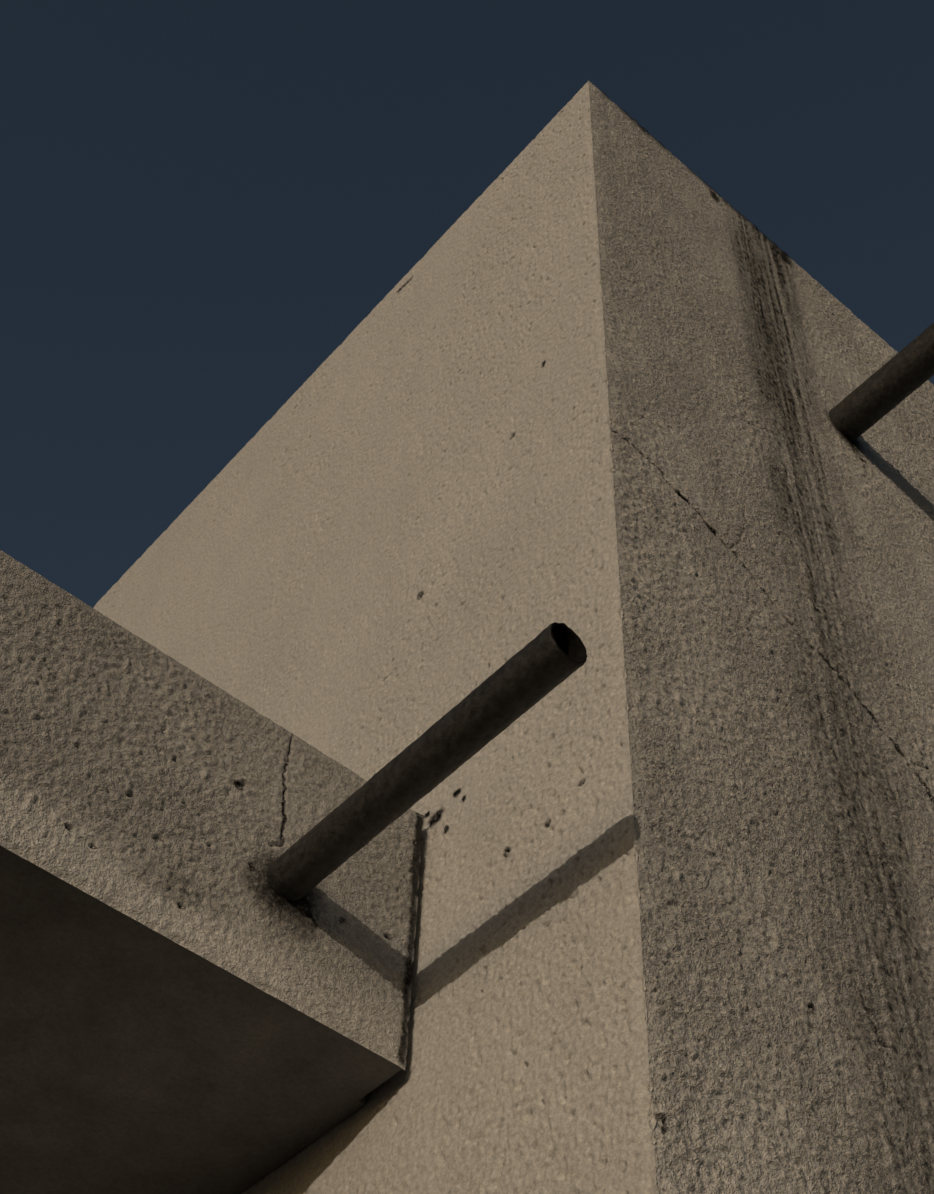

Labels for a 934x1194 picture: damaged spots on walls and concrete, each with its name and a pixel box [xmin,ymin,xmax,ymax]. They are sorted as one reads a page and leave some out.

crack [270,736,292,846]
crack [612,431,934,803]
damp [735,212,930,1074]